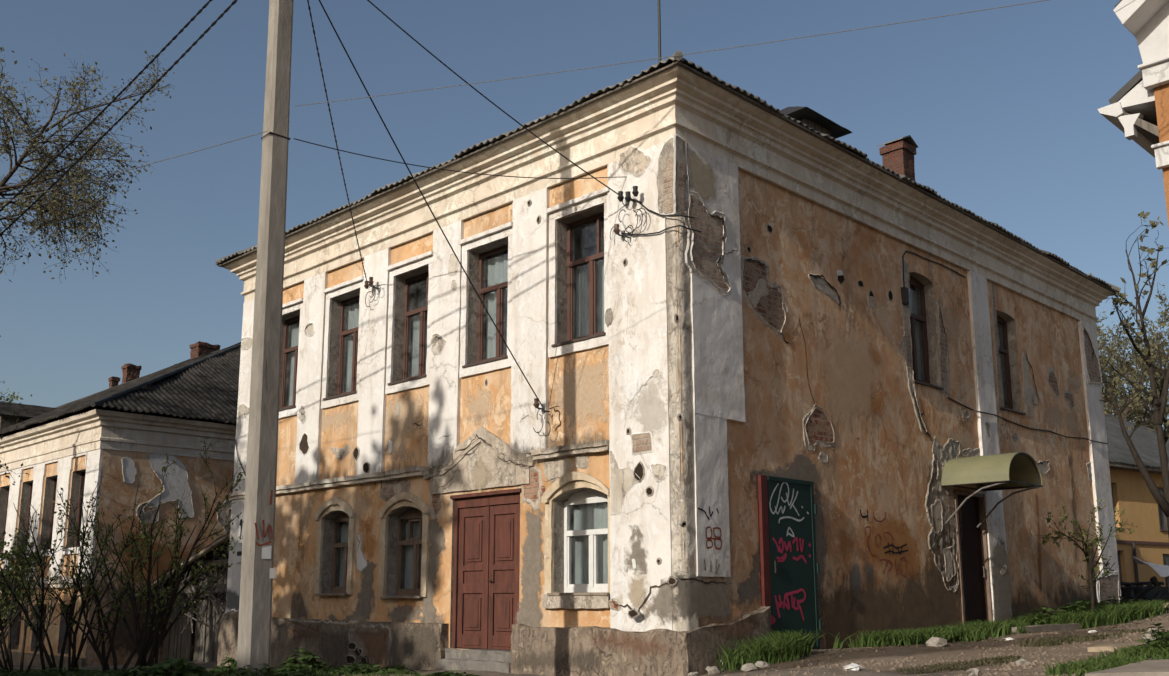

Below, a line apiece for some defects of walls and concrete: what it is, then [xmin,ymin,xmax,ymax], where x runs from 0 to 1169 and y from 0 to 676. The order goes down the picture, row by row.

flaking render [618,134,787,339]
peeling [808,270,843,311]
crack [782,319,817,407]
flaking render [802,403,836,463]
spalling [899,261,980,593]
peeling [121,453,195,525]
leakage [819,510,962,649]
leakage [392,628,437,670]
leakage [507,650,598,671]